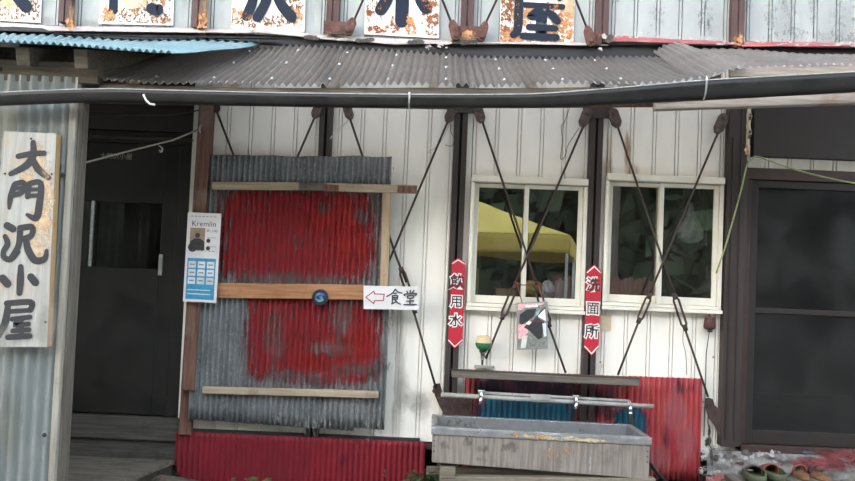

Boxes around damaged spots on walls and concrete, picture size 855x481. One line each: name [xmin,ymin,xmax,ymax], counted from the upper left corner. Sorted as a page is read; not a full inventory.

corrosion [0,0,40,20]
corrosion [100,0,172,24]
corrosion [231,0,305,28]
corrosion [366,0,439,35]
corrosion [500,0,575,45]
peeling [236,271,352,284]